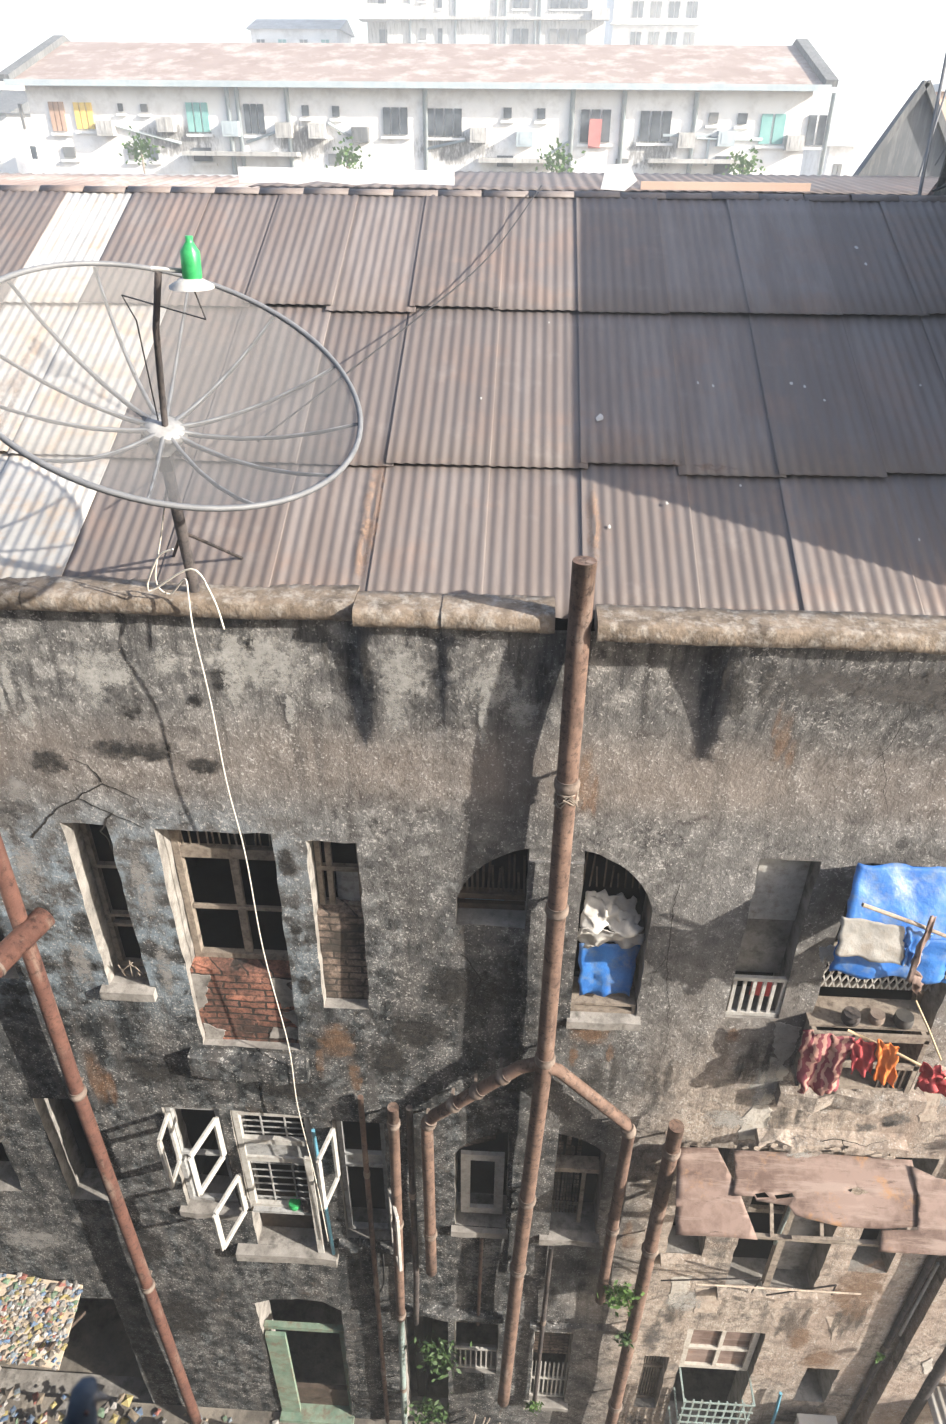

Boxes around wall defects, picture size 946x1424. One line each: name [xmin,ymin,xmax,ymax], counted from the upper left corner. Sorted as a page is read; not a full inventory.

leakage [74,651,136,707]
leakage [203,634,305,727]
leakage [321,640,429,733]
leakage [466,663,564,744]
leakage [32,750,69,776]
leakage [94,739,221,774]
peeling [277,848,296,876]
spalling [191,974,226,1039]
spalling [269,977,313,1040]
crack [647,885,680,1082]
leakage [256,1017,446,1101]
leakage [121,1228,166,1264]